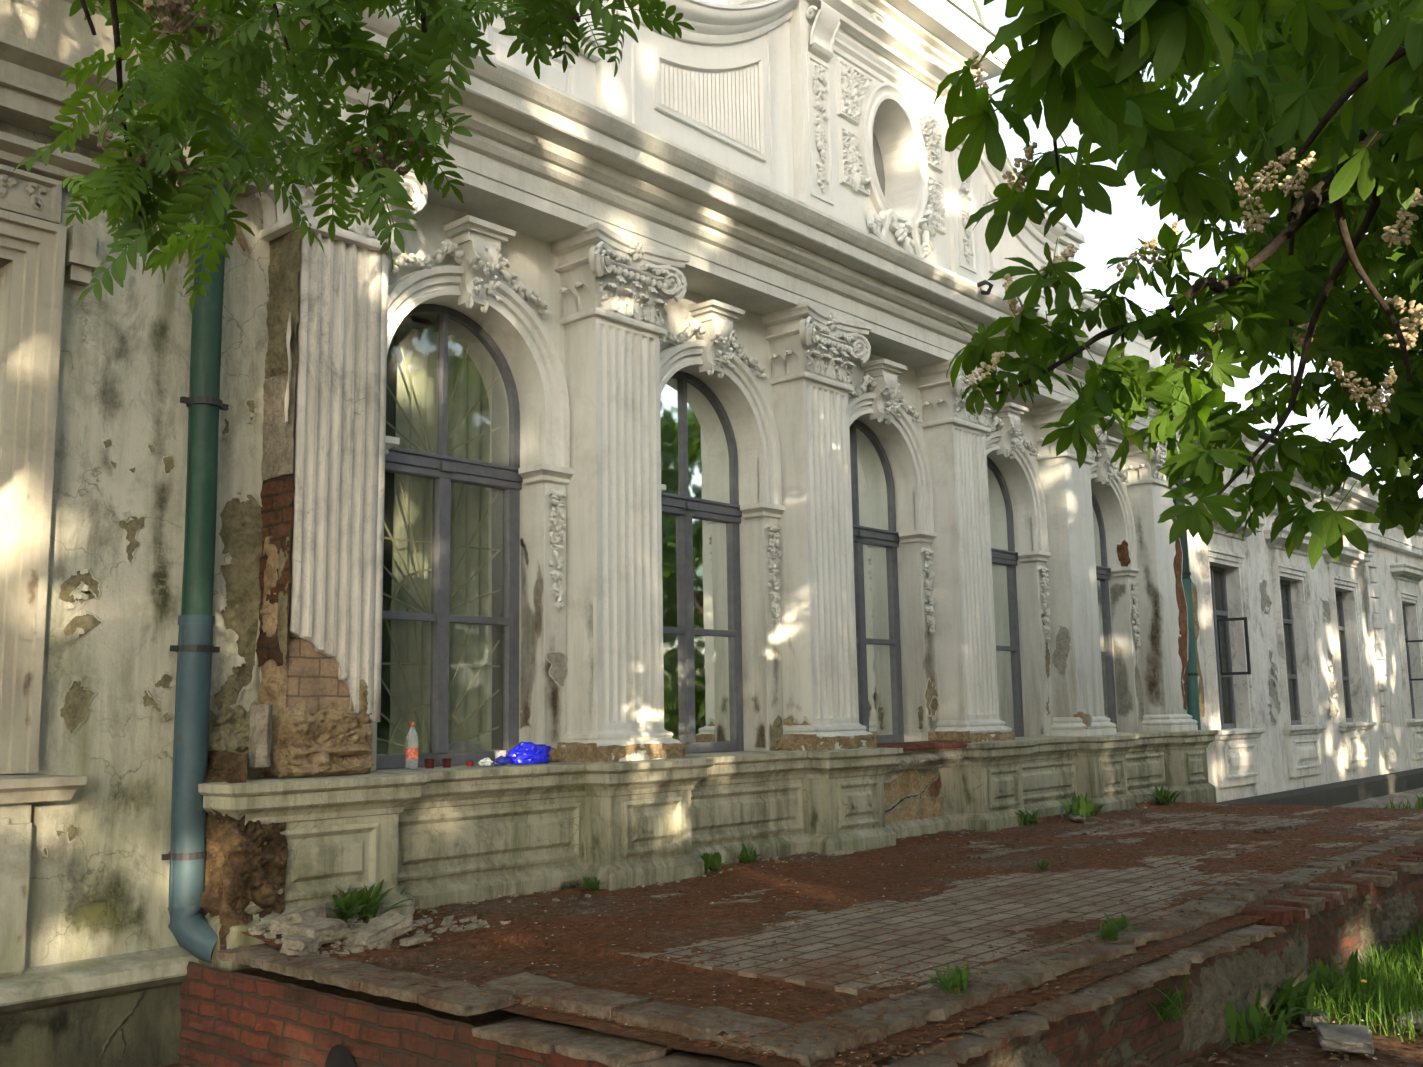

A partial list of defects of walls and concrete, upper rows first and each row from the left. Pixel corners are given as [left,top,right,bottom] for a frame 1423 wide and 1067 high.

peeling [109,510,146,566]
peeling [57,671,99,740]
peeling [55,567,105,646]
peeling [138,671,176,725]
spalling [205,473,375,783]
peeling [1040,609,1073,720]
spalling [1072,709,1092,729]
peeling [1115,538,1144,725]
flaking render [884,770,943,824]
spalling [200,807,288,950]